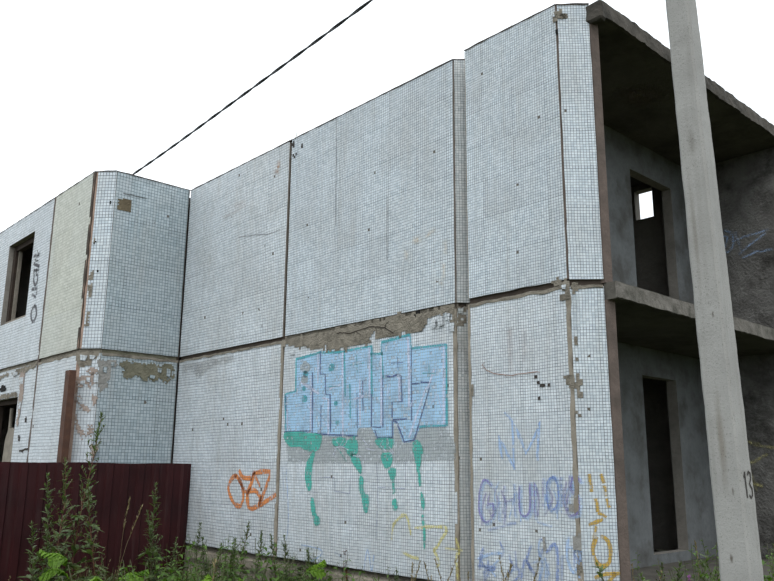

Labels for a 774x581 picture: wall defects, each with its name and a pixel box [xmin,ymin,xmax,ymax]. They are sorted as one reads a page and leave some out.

spalling [110,198,132,212]
spalling [282,304,469,354]
spalling [0,361,38,441]
peeling [74,351,175,461]